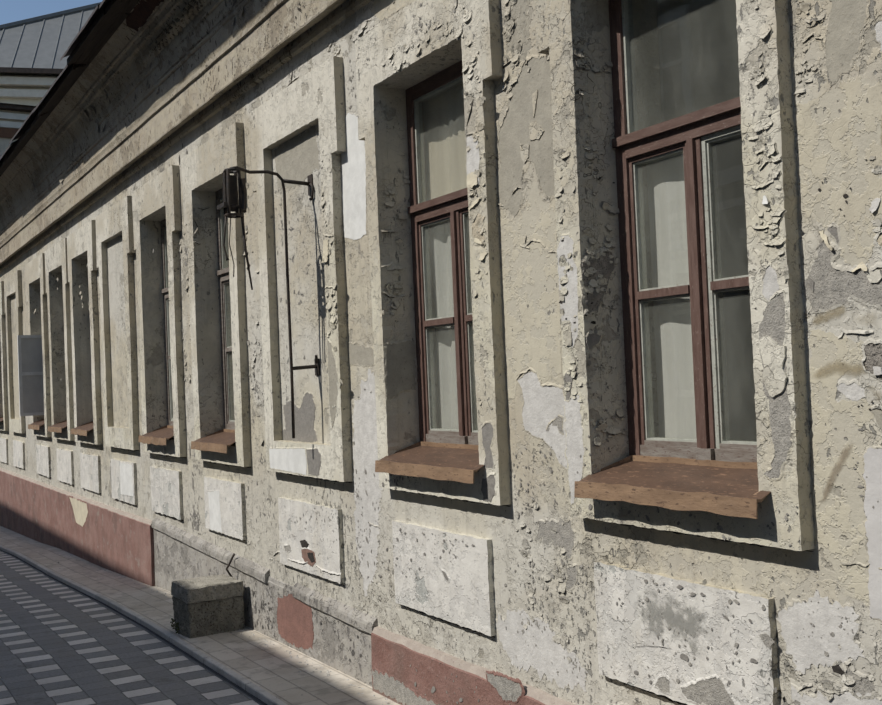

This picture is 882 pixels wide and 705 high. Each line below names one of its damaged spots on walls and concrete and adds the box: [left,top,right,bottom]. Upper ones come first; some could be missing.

peeling [274,40,367,262]
peeling [366,3,486,111]
peeling [465,121,487,280]
peeling [497,0,576,217]
peeling [748,25,773,88]
flaking render [803,187,882,314]
flaking render [245,315,323,498]
flaking render [486,191,625,705]
flaking render [759,289,797,482]
crack [609,522,764,547]
peeling [372,664,463,705]
flaking render [634,627,757,705]